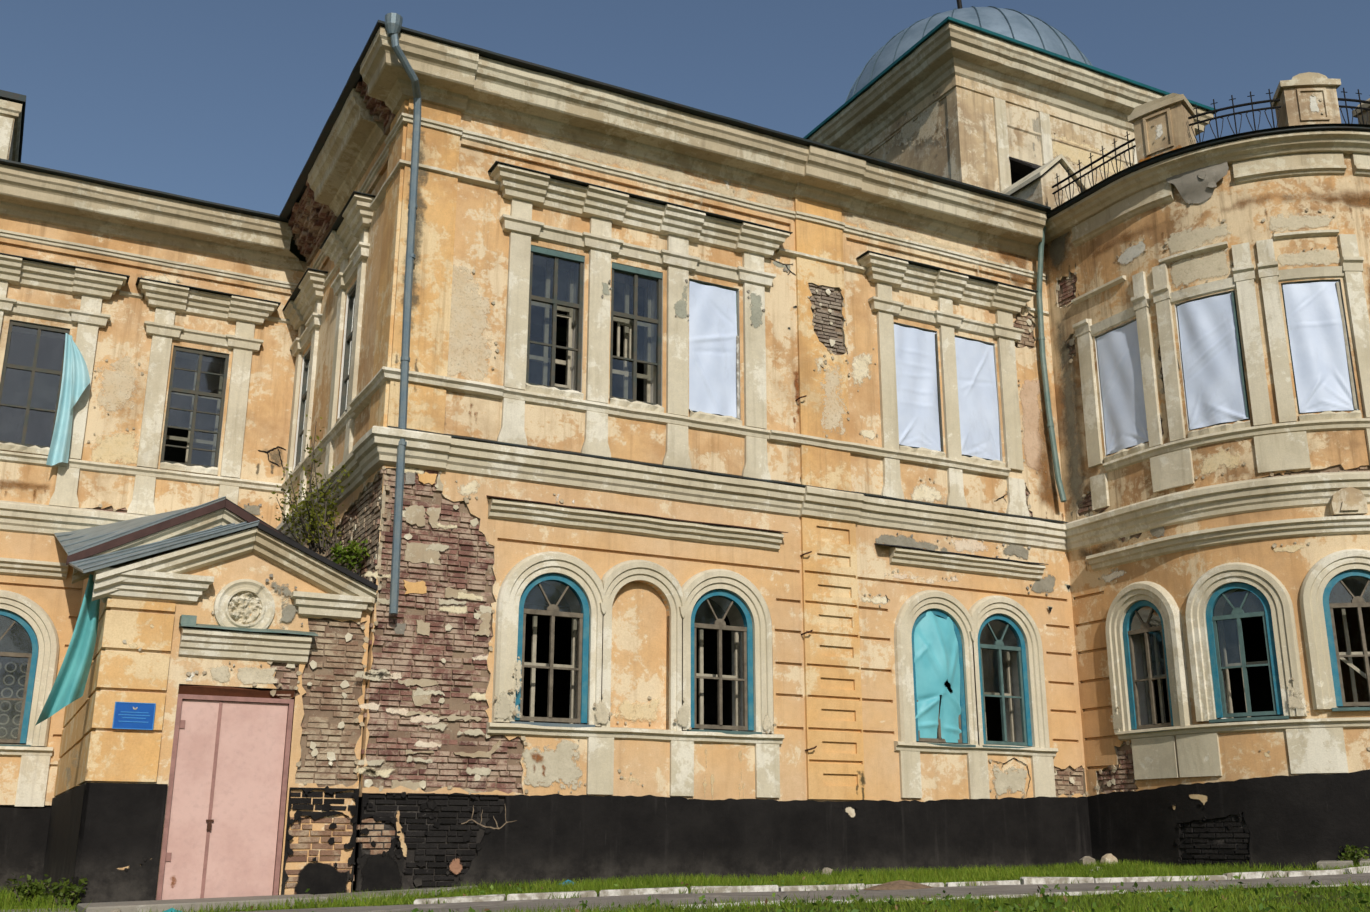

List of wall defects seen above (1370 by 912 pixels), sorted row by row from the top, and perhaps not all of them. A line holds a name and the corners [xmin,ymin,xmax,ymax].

spalling [793,283,878,441]
spalling [1013,311,1038,348]
spalling [1055,272,1077,307]
spalling [252,466,528,894]
spalling [1054,707,1137,797]